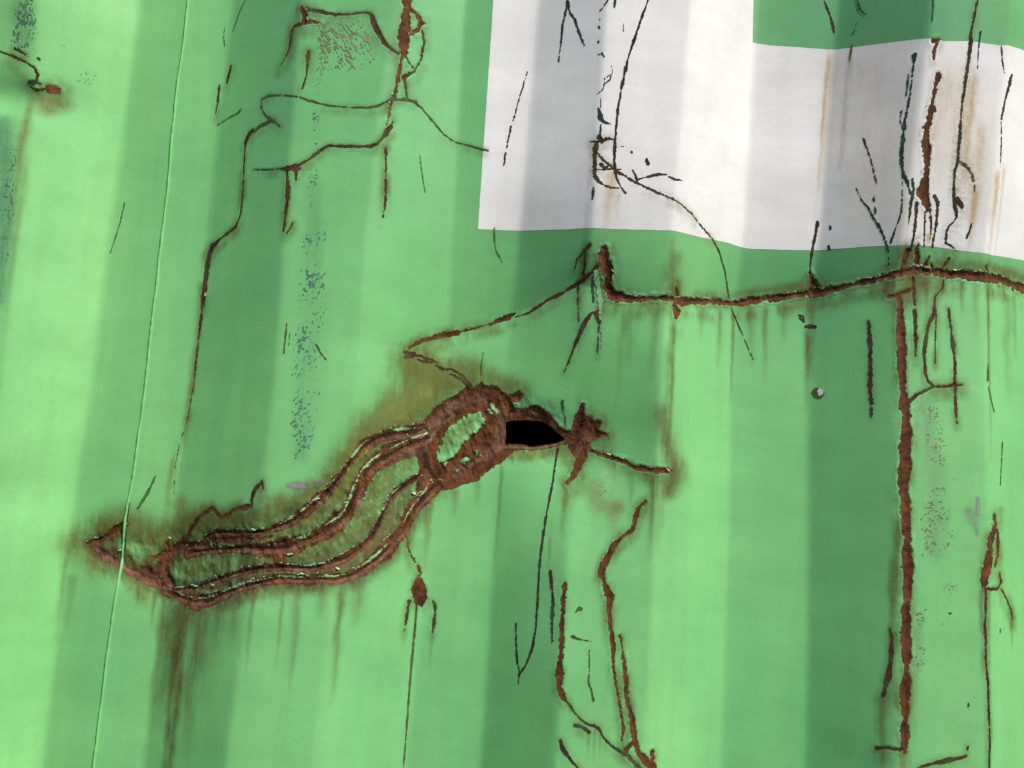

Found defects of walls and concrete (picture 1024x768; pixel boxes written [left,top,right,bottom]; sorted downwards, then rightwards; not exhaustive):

rust [45,84,61,94]
crack [173,0,528,493]
crack [403,0,1024,424]
rust [71,348,526,595]
spalling [86,381,610,612]
crack [515,399,673,768]